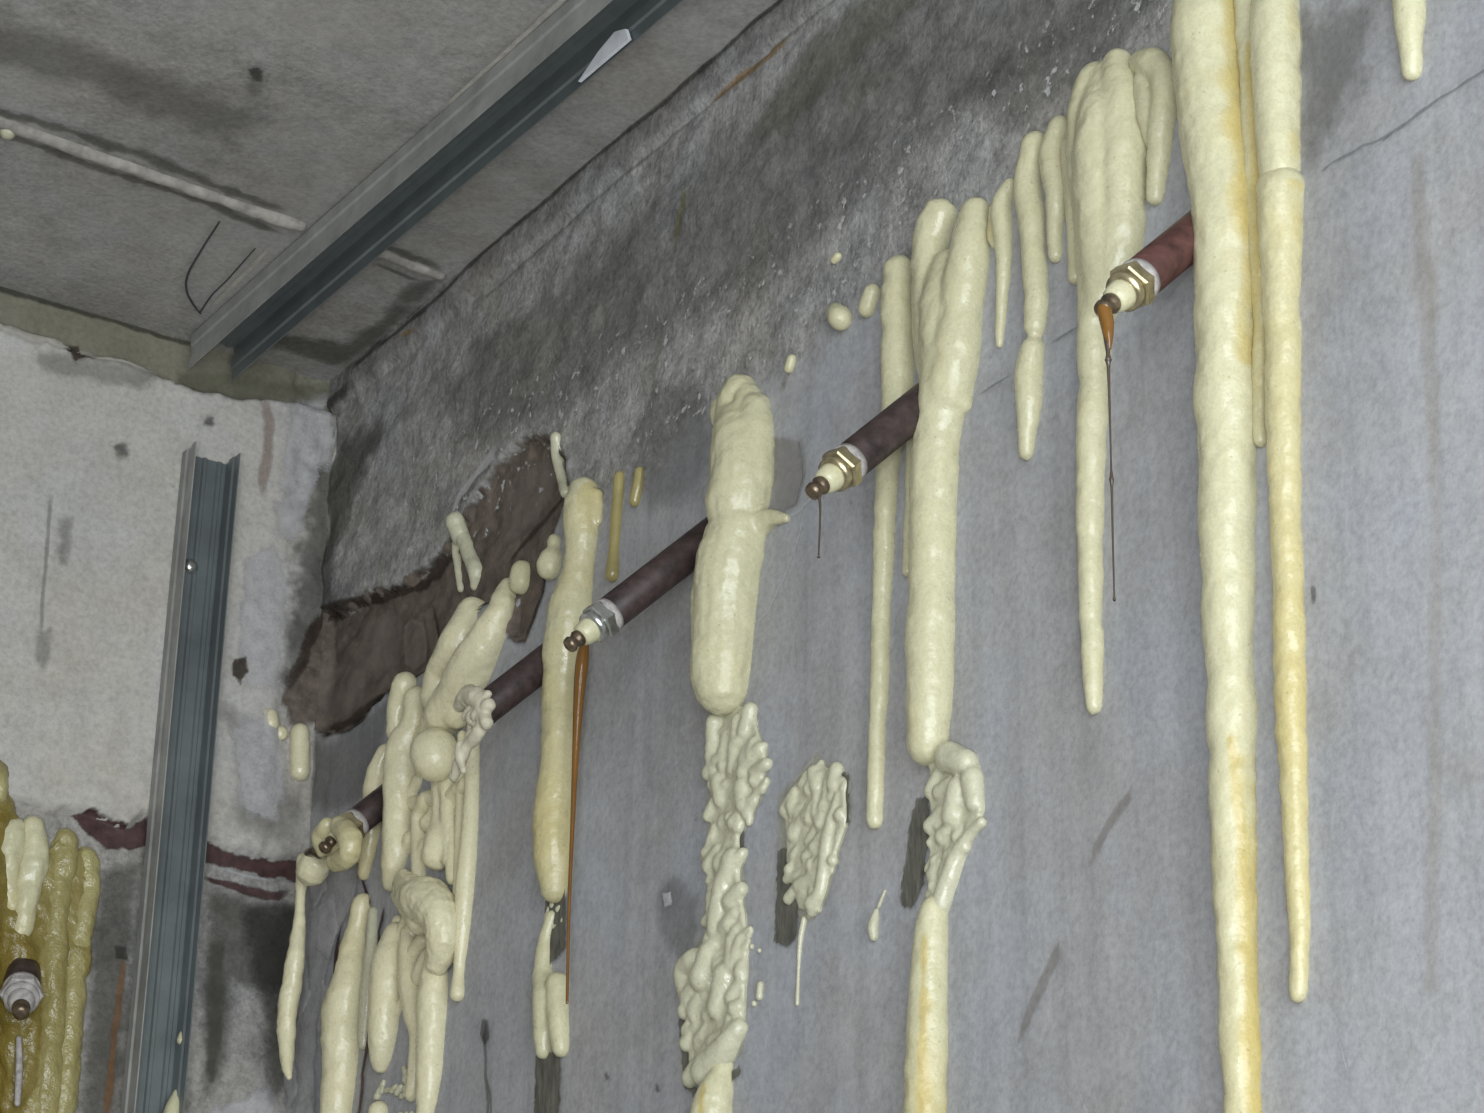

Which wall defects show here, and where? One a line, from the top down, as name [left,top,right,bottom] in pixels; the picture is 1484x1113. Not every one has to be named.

water stain [355,0,782,365]
water stain [406,180,879,521]
water stain [1044,28,1096,96]
spalling [282,435,569,735]